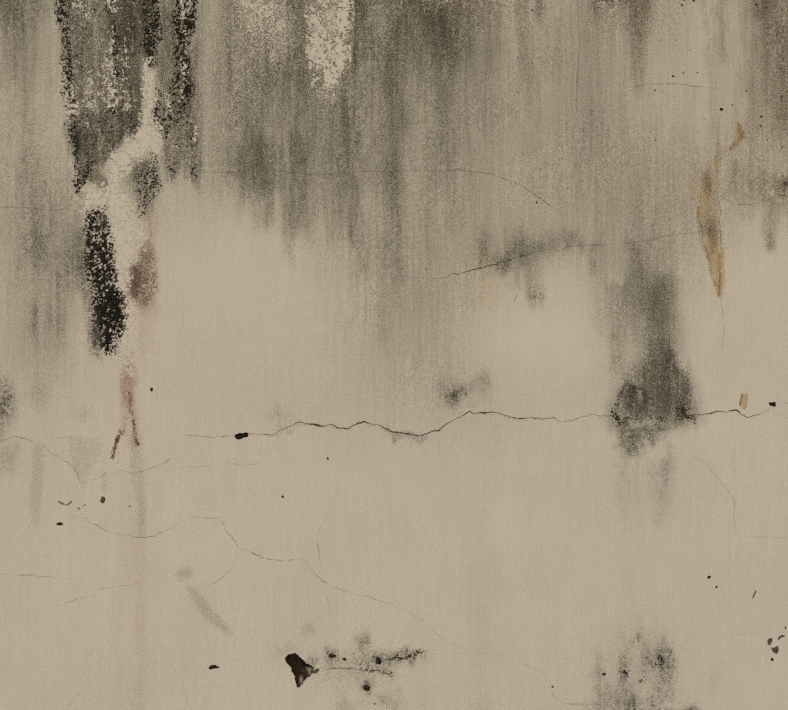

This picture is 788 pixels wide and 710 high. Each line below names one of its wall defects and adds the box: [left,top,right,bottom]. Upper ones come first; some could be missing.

leakage [54,0,201,218]
leakage [224,0,470,193]
leakage [57,205,130,356]
rust [694,160,724,295]
crack [194,402,788,443]
leakage [610,273,696,453]
crack [132,515,374,611]
spalling [285,653,320,688]